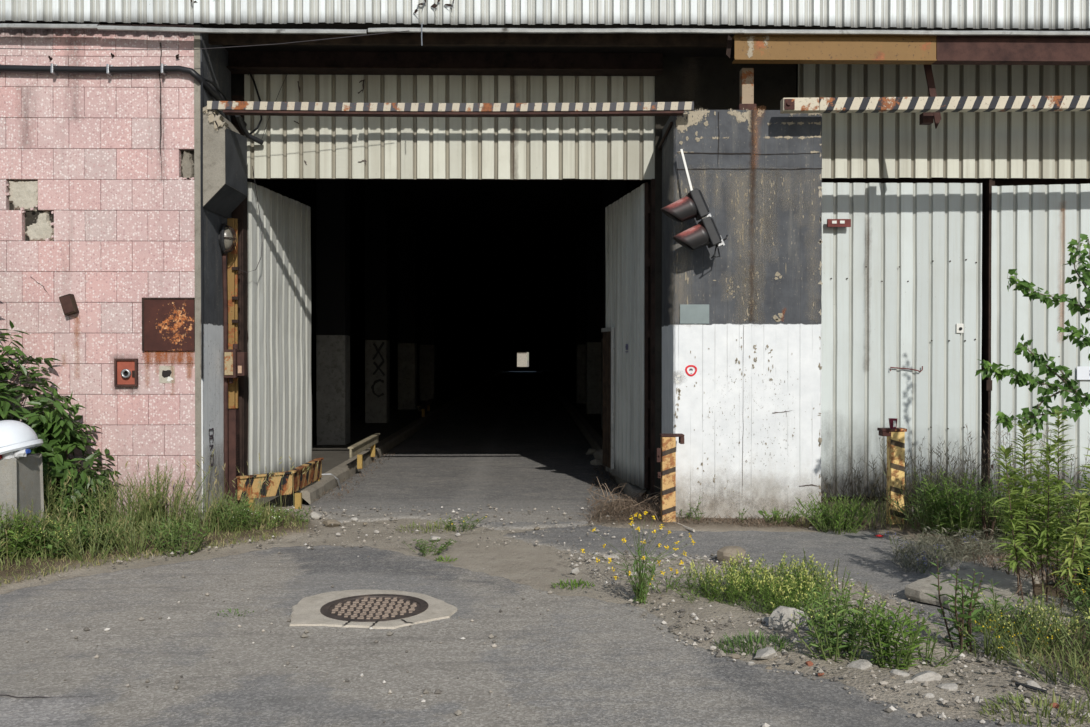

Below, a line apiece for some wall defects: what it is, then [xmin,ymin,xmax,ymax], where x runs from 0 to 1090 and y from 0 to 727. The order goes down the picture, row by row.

spalling [676,108,822,156]
peeling [178,150,194,180]
peeling [5,180,54,241]
peeling [677,172,822,321]
corrosion [145,351,193,376]
peeling [697,337,821,492]